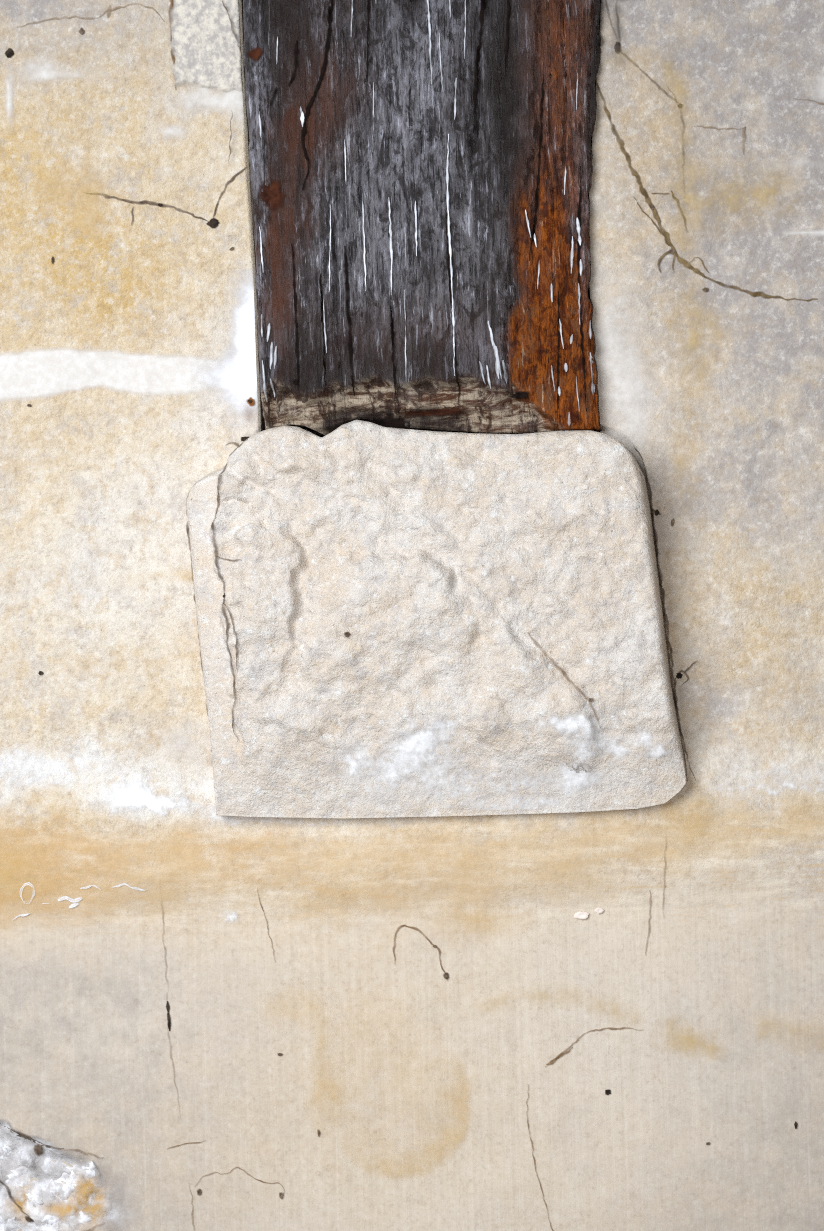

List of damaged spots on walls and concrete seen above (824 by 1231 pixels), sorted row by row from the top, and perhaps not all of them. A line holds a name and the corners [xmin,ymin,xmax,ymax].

crack [222,1,243,59]
crack [606,5,627,57]
crack [86,110,247,228]
crack [595,78,817,301]
crack [186,435,251,752]
damp [0,873,158,920]
crack [393,925,449,982]
crack [545,1027,636,1067]
flaking render [0,1121,119,1231]
crack [526,1094,553,1231]